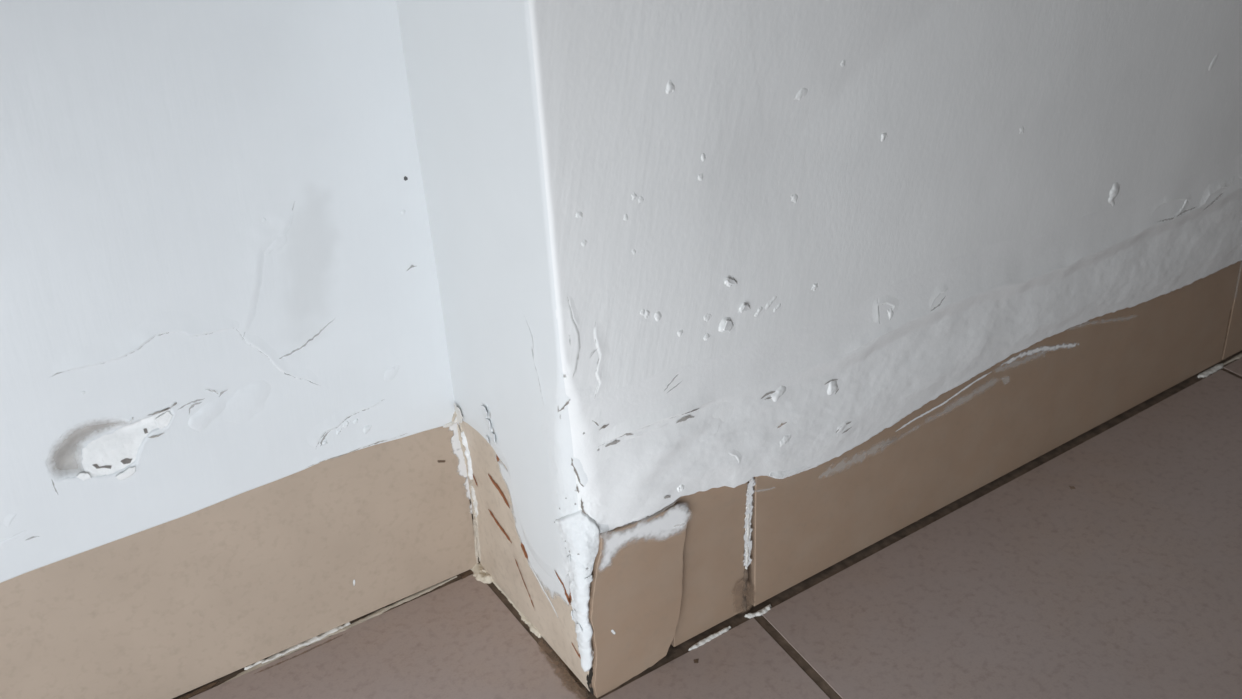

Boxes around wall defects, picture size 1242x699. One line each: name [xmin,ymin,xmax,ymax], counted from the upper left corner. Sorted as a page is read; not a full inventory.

flaking render [39,402,180,486]
rust [472,473,509,507]
spalling [538,295,689,698]
rust [488,509,534,607]